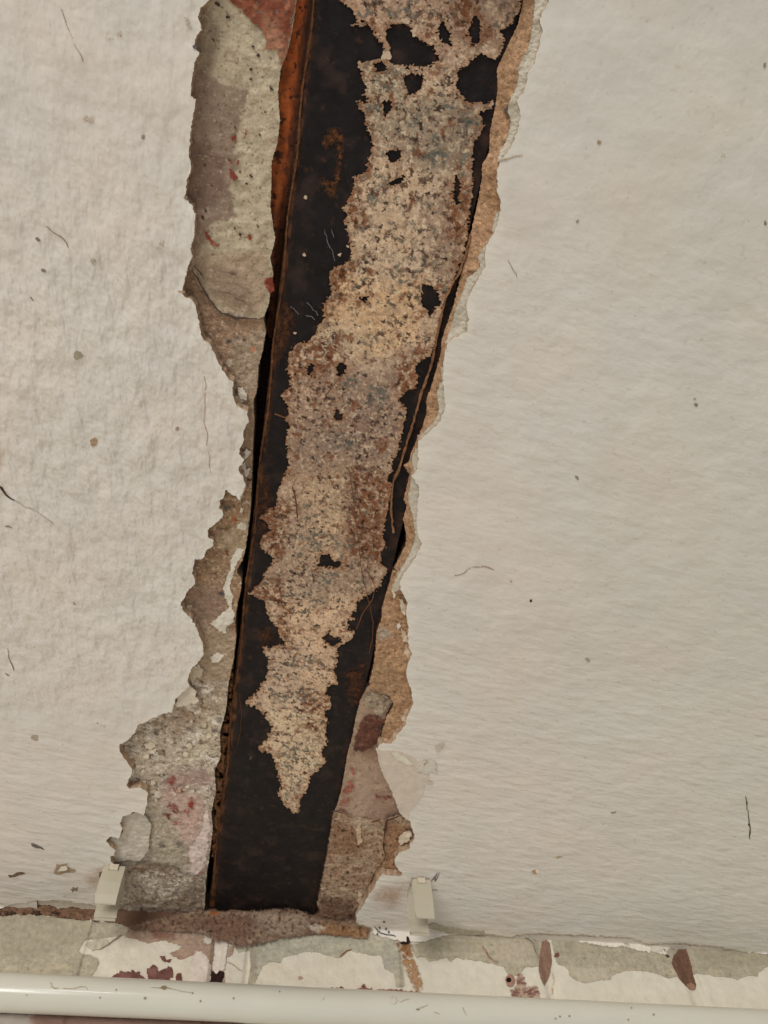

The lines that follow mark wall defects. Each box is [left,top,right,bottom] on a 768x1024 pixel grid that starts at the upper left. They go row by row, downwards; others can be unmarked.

crack [203,377,211,472]
crack [178,265,257,320]
rust [211,0,315,896]
spalling [0,0,548,992]
rust [390,234,471,533]
peeling [410,923,768,998]